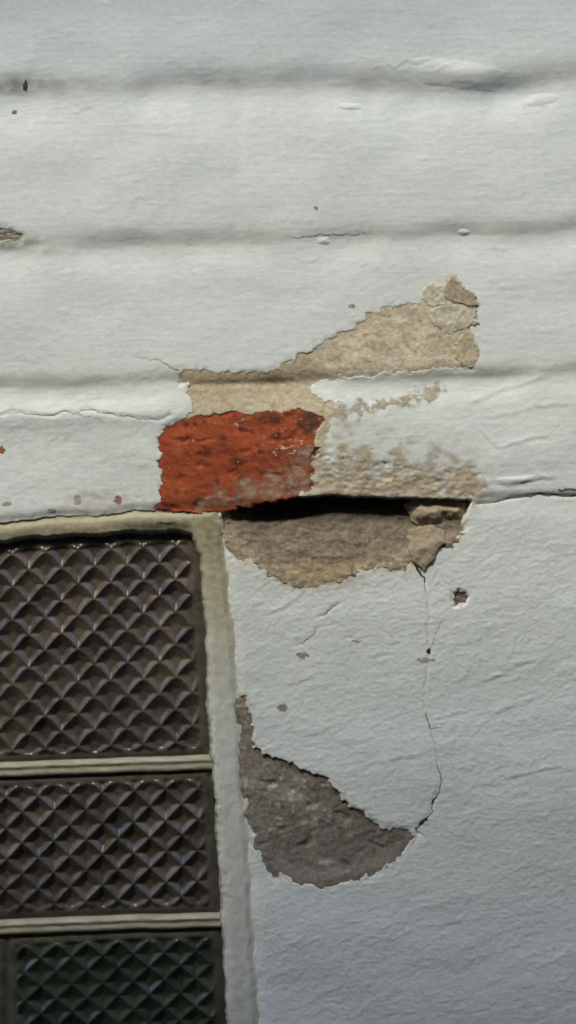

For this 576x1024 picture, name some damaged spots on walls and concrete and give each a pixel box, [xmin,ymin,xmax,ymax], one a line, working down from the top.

peeling [0,229,23,242]
peeling [157,274,485,589]
peeling [454,591,468,605]
flaking render [234,696,414,889]
crack [415,564,445,830]